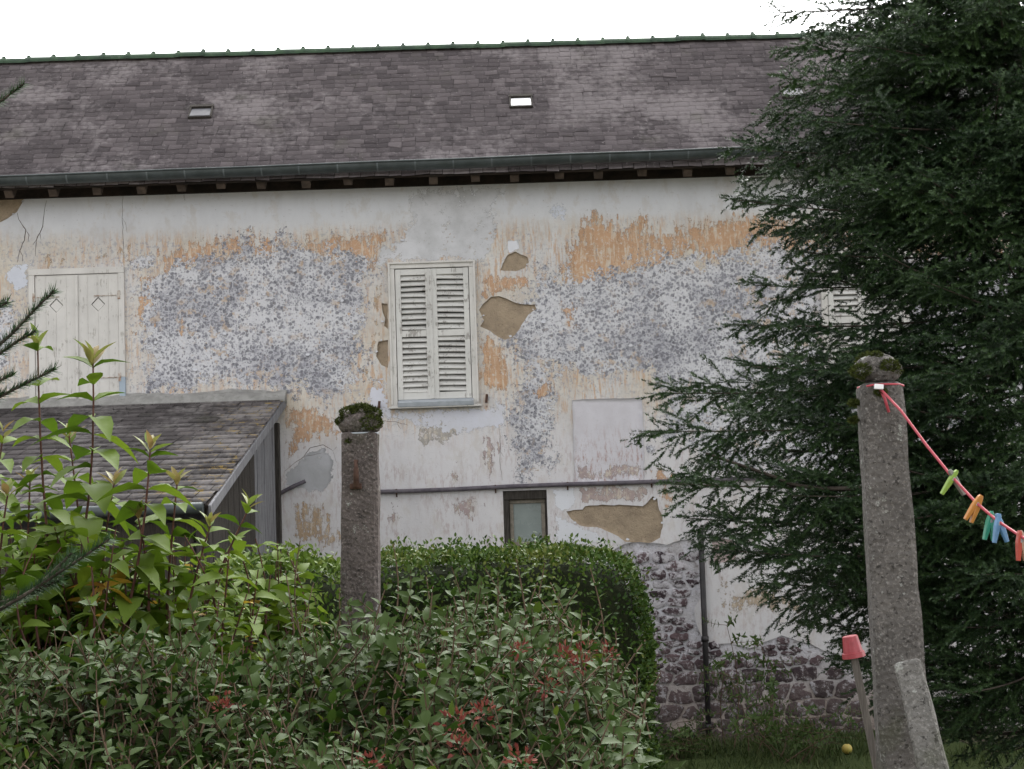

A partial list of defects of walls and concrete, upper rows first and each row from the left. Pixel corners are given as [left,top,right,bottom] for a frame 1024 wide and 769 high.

spalling [0,199,24,222]
crack [17,201,47,262]
peeling [127,225,388,410]
leakage [130,228,394,336]
peeling [479,232,859,484]
spalling [566,485,664,543]